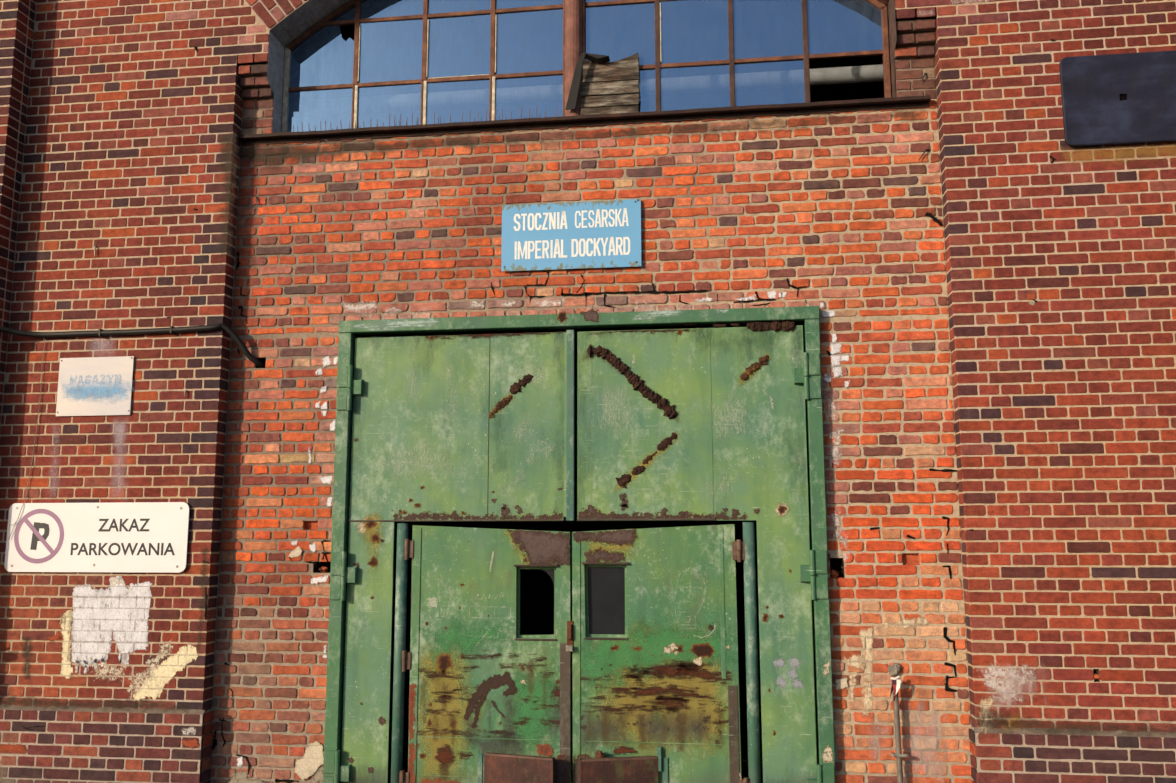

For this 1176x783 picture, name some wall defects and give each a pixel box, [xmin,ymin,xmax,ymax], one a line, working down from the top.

rust [713,320,796,332]
rust [739,355,769,384]
rust [352,309,760,568]
rust [775,503,790,517]
hole [830,558,845,579]
peeling [91,653,129,681]
rust [580,625,731,755]
damp [979,666,1171,734]
rust [408,653,560,783]
peeling [275,765,323,783]
rust [537,743,592,783]